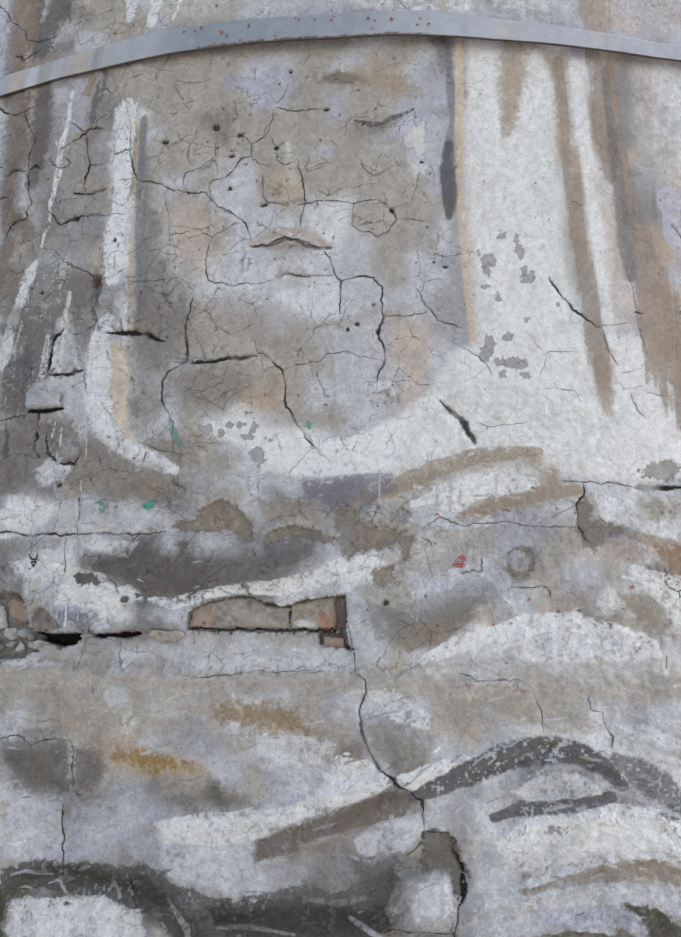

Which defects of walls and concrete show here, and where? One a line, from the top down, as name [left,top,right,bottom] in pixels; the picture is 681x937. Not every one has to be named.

corrosion [197,17,430,49]
damp [86,69,108,122]
damp [441,141,457,219]
crack [0,91,457,456]
peeling [476,250,501,301]
peeling [497,230,535,283]
peeling [479,332,530,379]
crack [423,384,525,444]
crack [658,484,681,492]
spalling [0,593,60,659]
spalling [148,596,351,649]
crack [376,764,467,937]